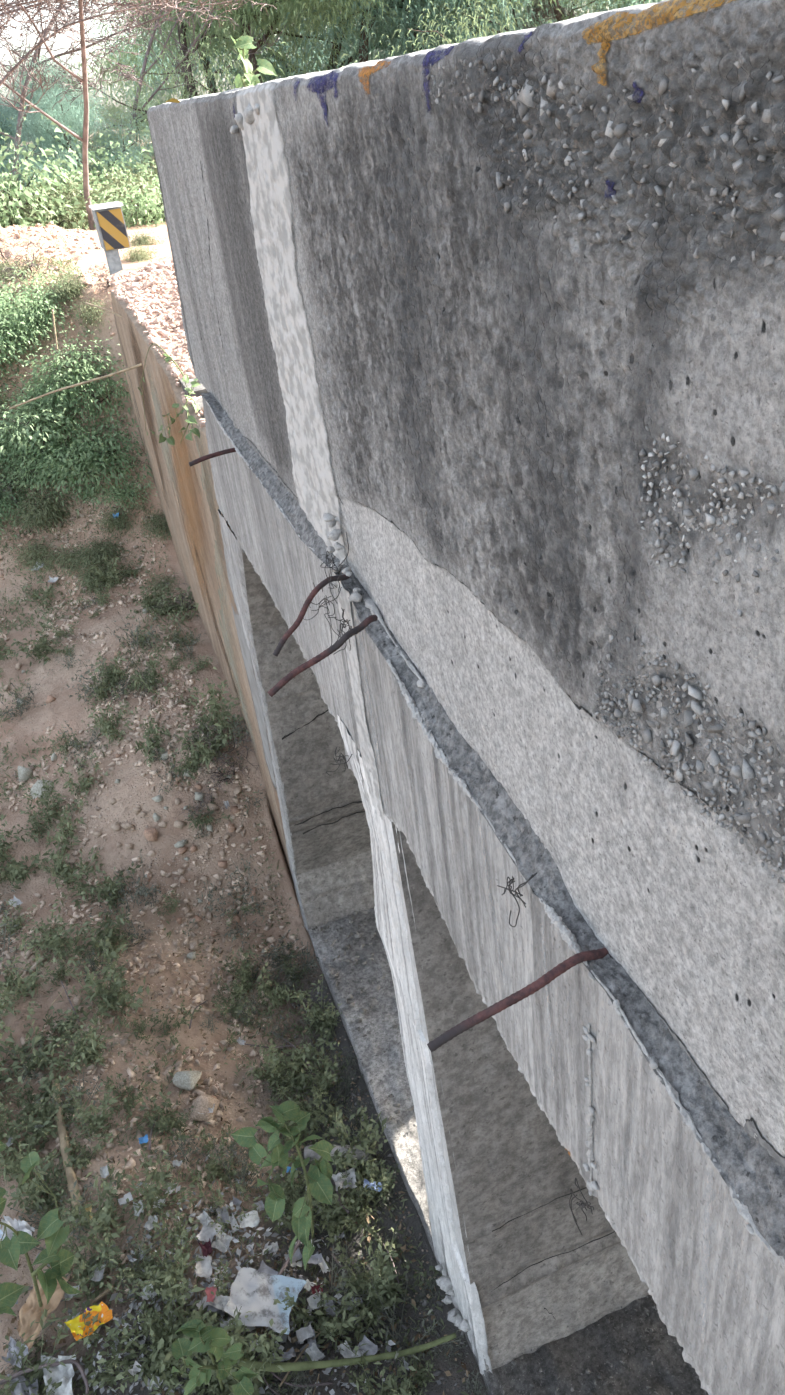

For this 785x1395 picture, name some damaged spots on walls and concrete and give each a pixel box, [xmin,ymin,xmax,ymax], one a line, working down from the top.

crack [282,709,329,740]
crack [567,694,597,722]
crack [636,750,718,814]
crack [295,801,365,834]
spalling [638,988,729,1111]
spalling [743,1117,785,1170]